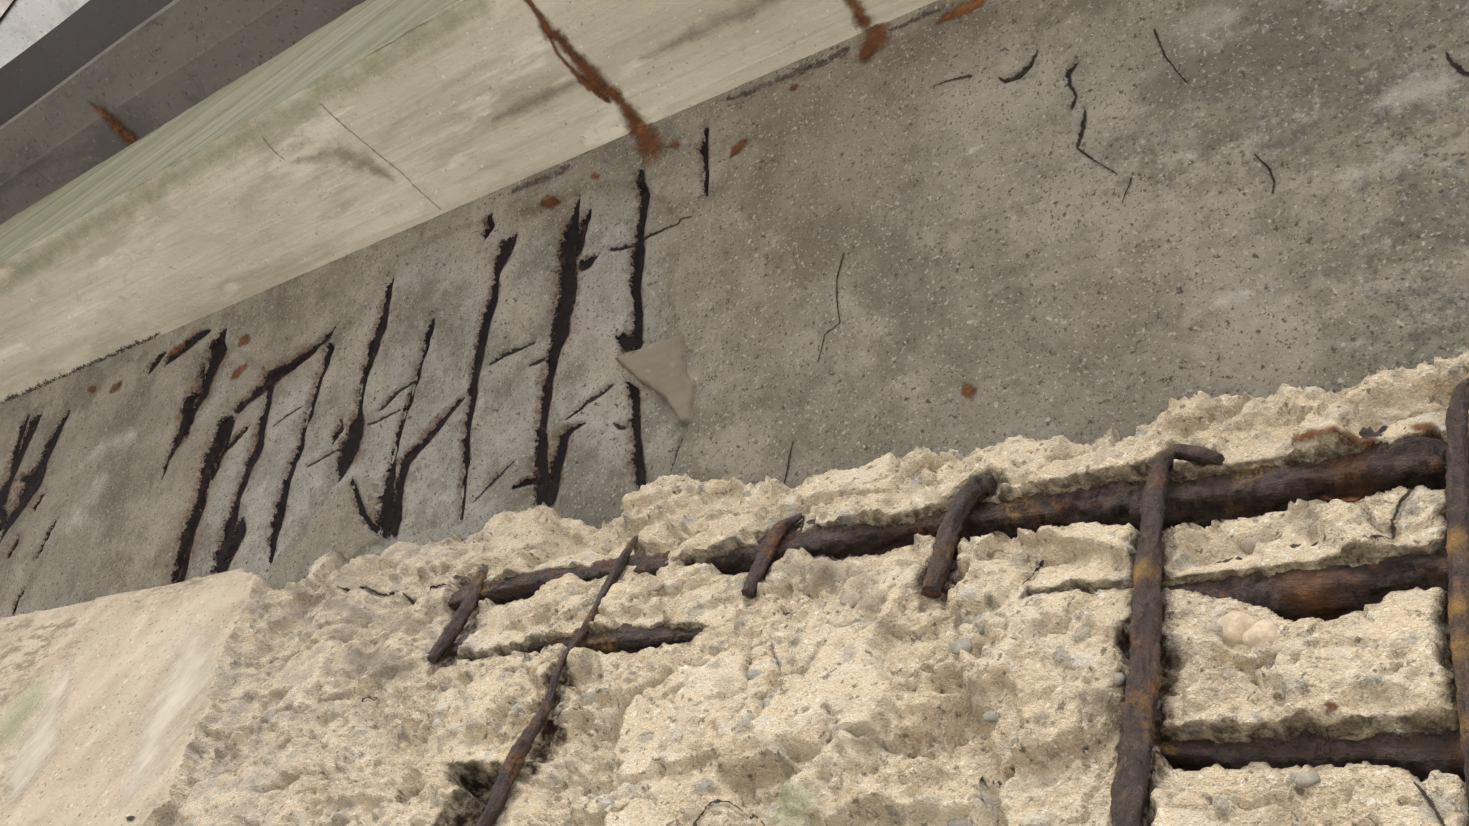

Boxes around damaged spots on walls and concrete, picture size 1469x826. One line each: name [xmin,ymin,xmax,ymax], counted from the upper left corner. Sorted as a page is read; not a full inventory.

rust [845,0,888,62]
rust [936,0,983,23]
rust [524,0,679,163]
crack [1446,52,1469,76]
rust [89,102,138,145]
crack [932,50,1132,202]
crack [147,128,709,584]
rust [1292,426,1377,447]
rust [1410,422,1435,430]
crack [0,410,70,614]
spalling [142,178,1469,826]
crack [693,799,765,826]